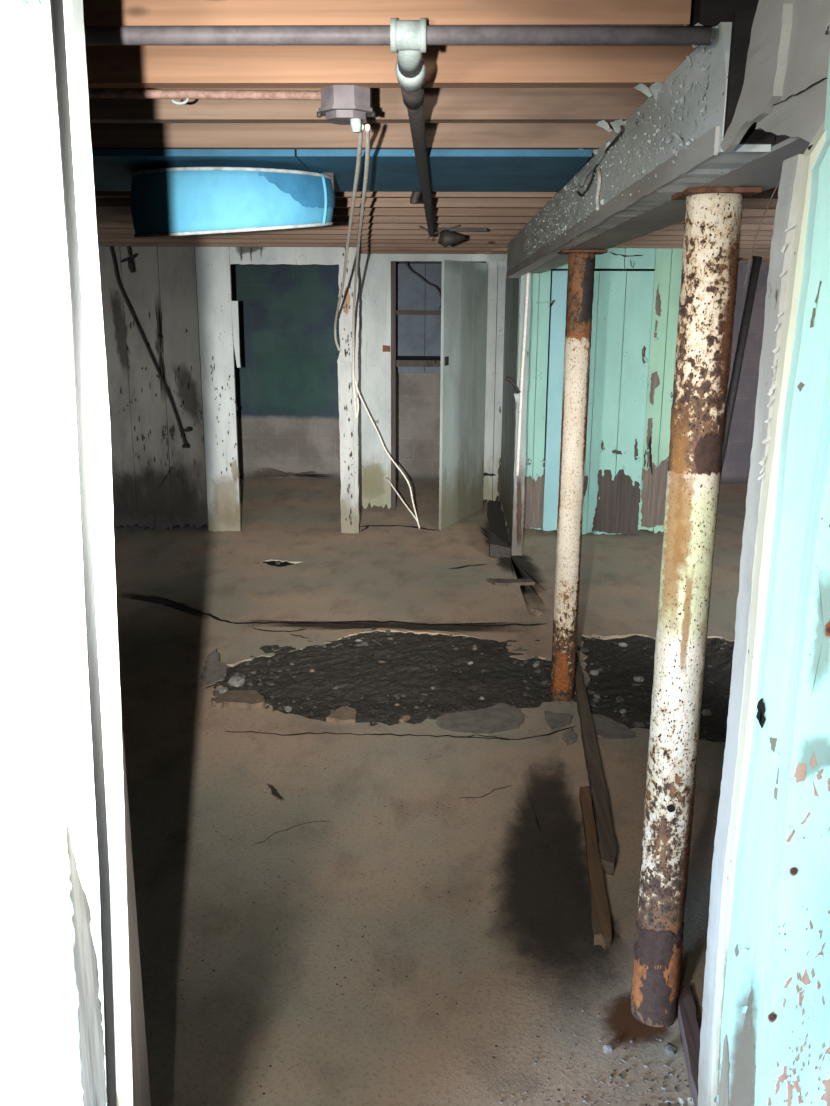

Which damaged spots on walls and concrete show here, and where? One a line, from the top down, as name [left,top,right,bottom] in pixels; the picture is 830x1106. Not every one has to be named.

damp [112,299,129,367]
damp [156,308,198,417]
rust [579,256,595,323]
peeling [641,285,662,405]
rust [719,239,740,382]
damp [121,471,190,517]
peeling [583,418,669,536]
rust [663,416,726,659]
crack [157,598,544,638]
peeling [770,737,830,801]
rust [604,922,684,1043]
peeling [752,1044,802,1106]